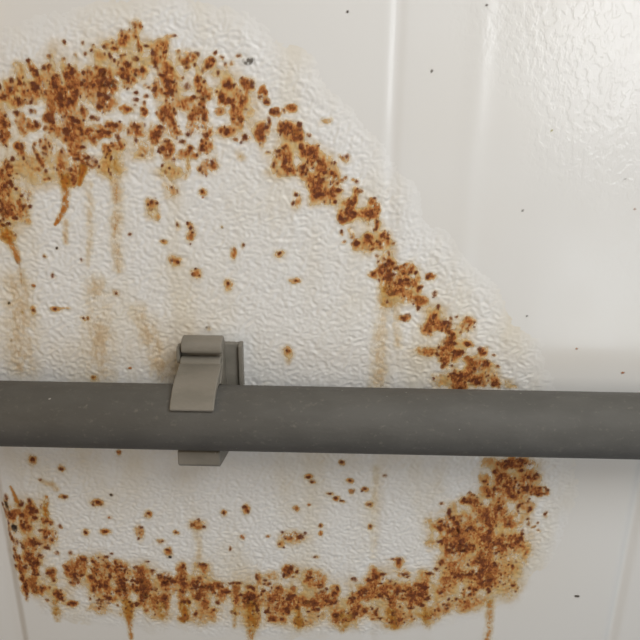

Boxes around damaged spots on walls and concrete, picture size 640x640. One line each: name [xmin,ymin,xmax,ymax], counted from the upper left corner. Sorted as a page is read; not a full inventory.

rust [0,21,516,389]
rust [2,457,549,640]